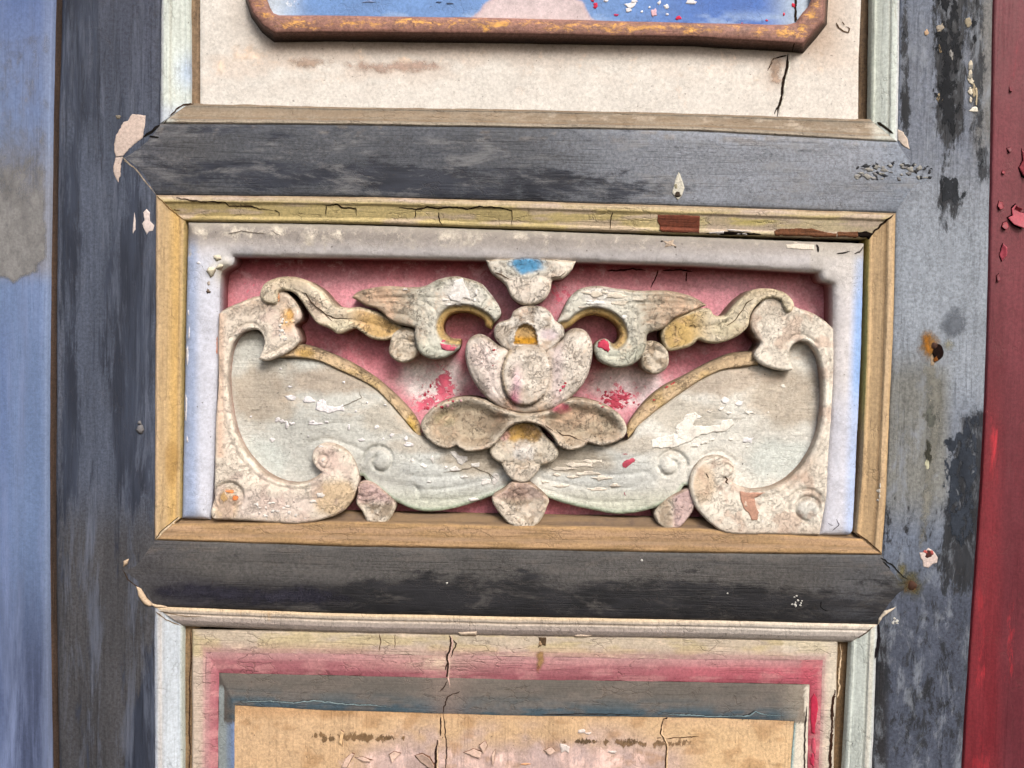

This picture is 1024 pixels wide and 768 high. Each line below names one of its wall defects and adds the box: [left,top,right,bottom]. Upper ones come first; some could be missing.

crack [768,0,797,116]
peeling [113,114,146,182]
peeling [854,161,966,209]
crack [325,204,357,216]
crack [399,206,513,226]
peeling [997,201,1024,230]
corrosion [921,333,952,365]
peeling [651,397,754,449]
peeling [740,491,763,520]
peeling [919,548,938,568]
crack [434,635,460,768]
crack [542,624,881,768]